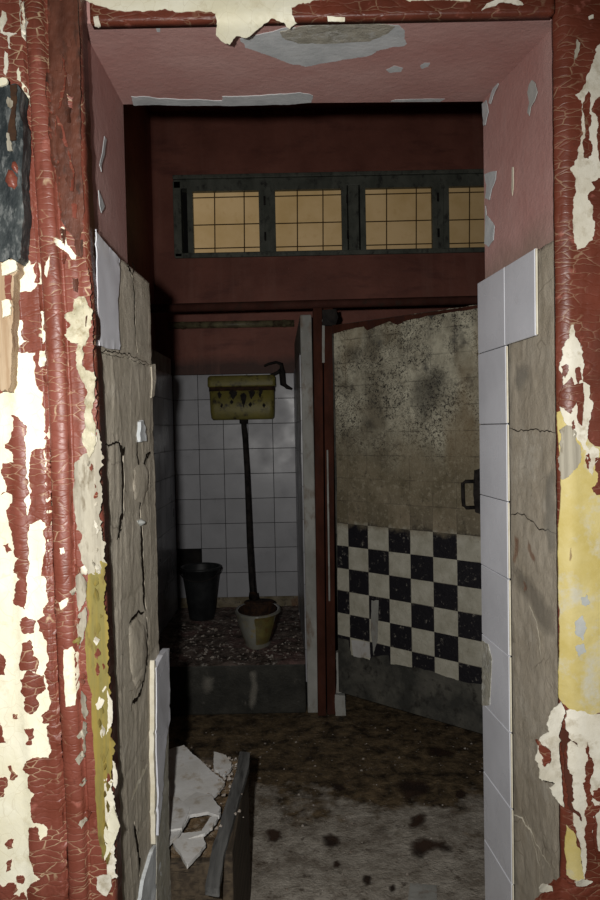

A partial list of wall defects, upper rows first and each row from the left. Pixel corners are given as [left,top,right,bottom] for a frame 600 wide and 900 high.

peeling [481,0,523,11]
peeling [482,83,499,126]
peeling [527,80,538,116]
peeling [570,44,600,250]
peeling [484,171,497,247]
peeling [0,0,407,900]
crack [105,440,151,710]
spalling [506,241,600,900]
water stain [267,829,281,841]
water stain [324,834,339,846]
water stain [410,814,425,827]
water stain [412,839,450,856]